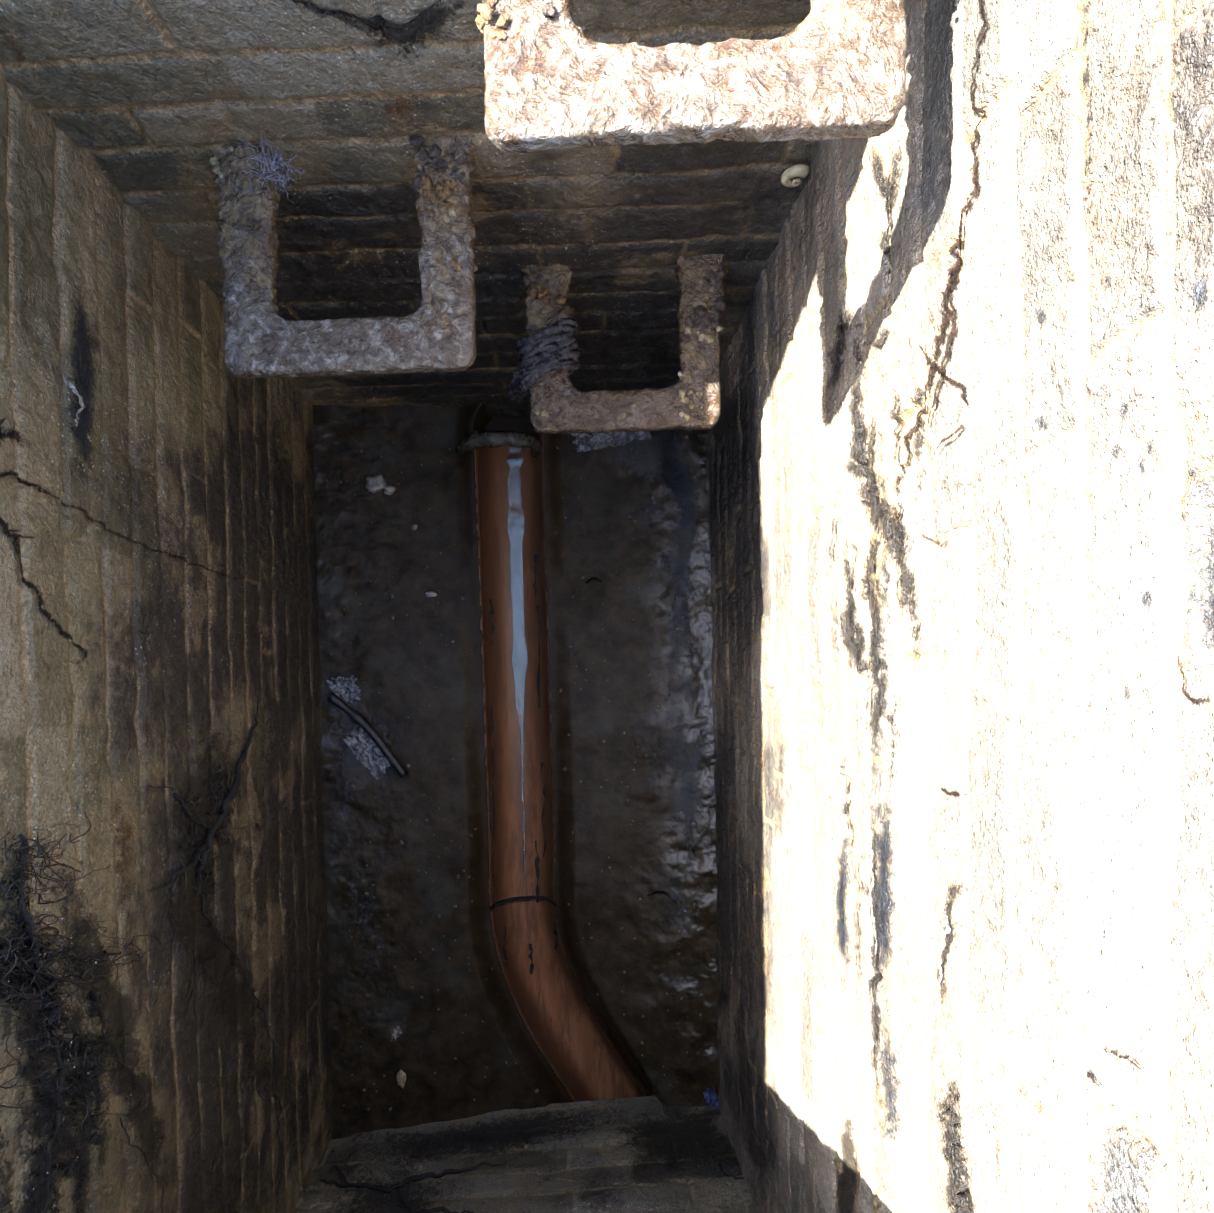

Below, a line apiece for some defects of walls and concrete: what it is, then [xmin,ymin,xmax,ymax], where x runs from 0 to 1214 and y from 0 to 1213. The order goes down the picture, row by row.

crack [292,0,389,40]
water stain [867,135,902,278]
crack [893,0,988,493]
crack [0,517,88,663]
crack [0,418,237,579]
water stain [595,430,701,515]
crack [920,532,960,547]
water stain [822,306,926,1141]
water stain [170,726,276,1085]
water stain [0,842,171,1213]
water stain [836,1119,858,1213]
water stain [936,1080,973,1213]